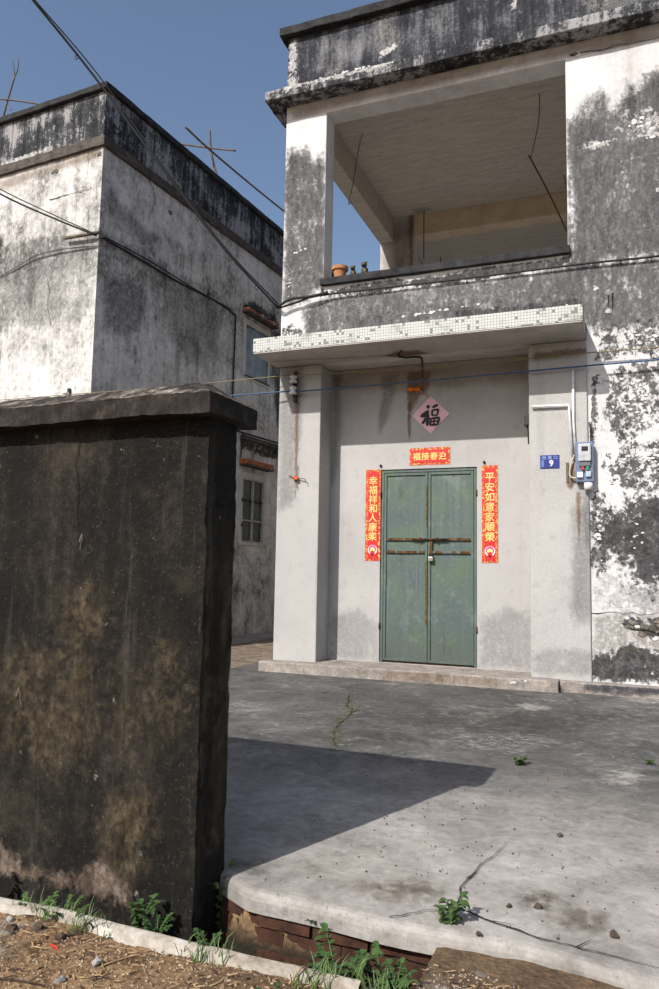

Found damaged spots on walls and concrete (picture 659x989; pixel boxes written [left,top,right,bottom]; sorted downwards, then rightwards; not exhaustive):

peeling [583,107,659,150]
damp [240,70,659,602]
rust [386,538,470,626]
crack [333,695,361,748]
crack [389,843,658,968]